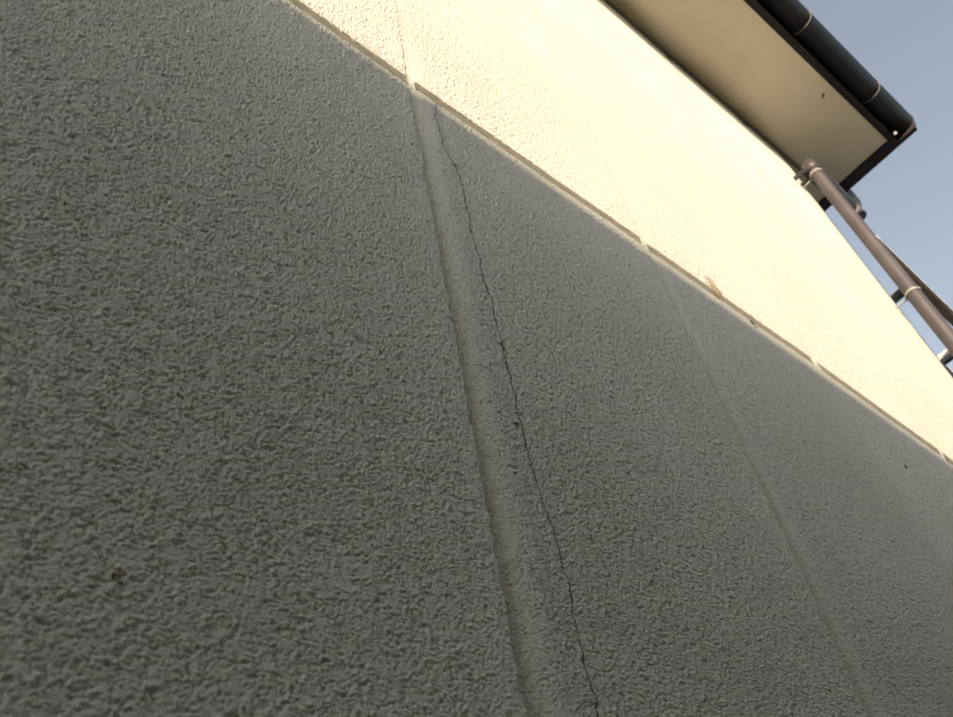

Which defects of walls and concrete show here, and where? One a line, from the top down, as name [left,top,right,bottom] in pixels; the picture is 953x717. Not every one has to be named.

crack [434,104,598,717]